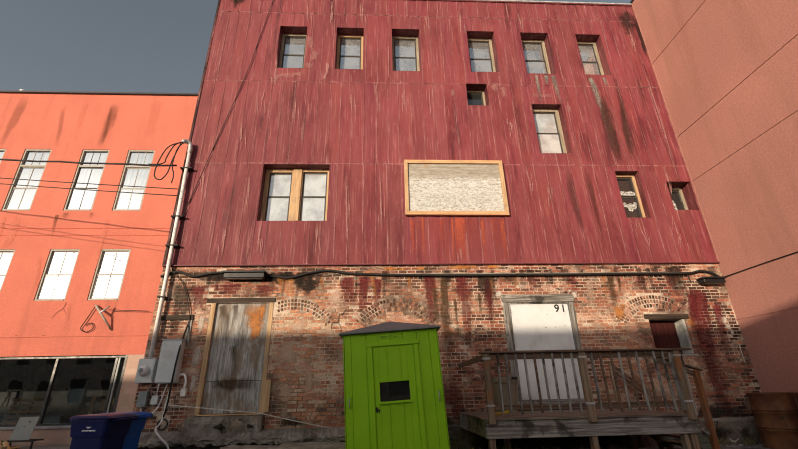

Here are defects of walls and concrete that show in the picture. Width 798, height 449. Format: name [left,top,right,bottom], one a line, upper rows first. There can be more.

damp [588,78,633,153]
damp [356,272,386,300]
damp [433,270,504,328]
rust [248,306,265,339]
damp [713,304,726,337]